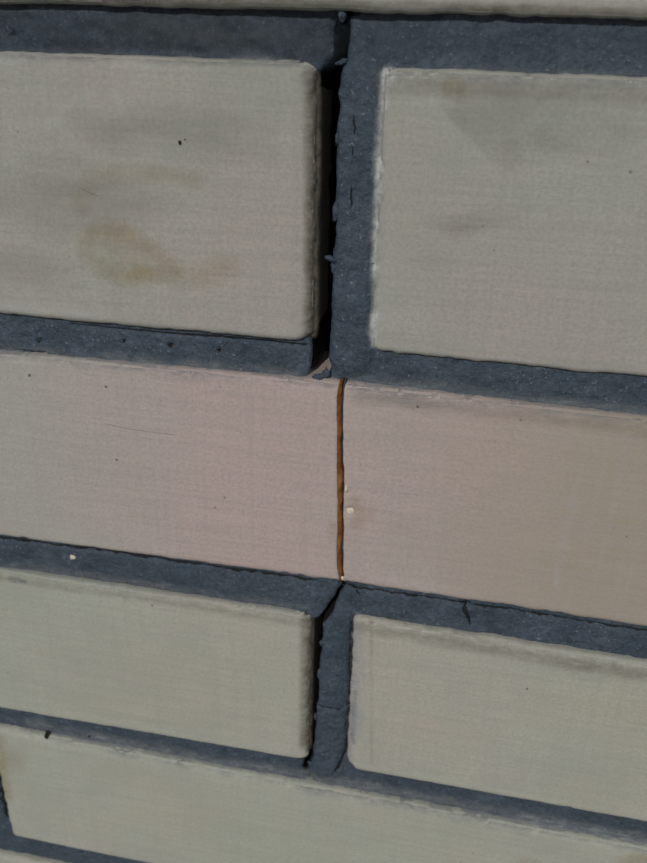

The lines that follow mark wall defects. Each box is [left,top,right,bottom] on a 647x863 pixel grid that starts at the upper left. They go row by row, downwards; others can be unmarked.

crack [70,10,647,777]